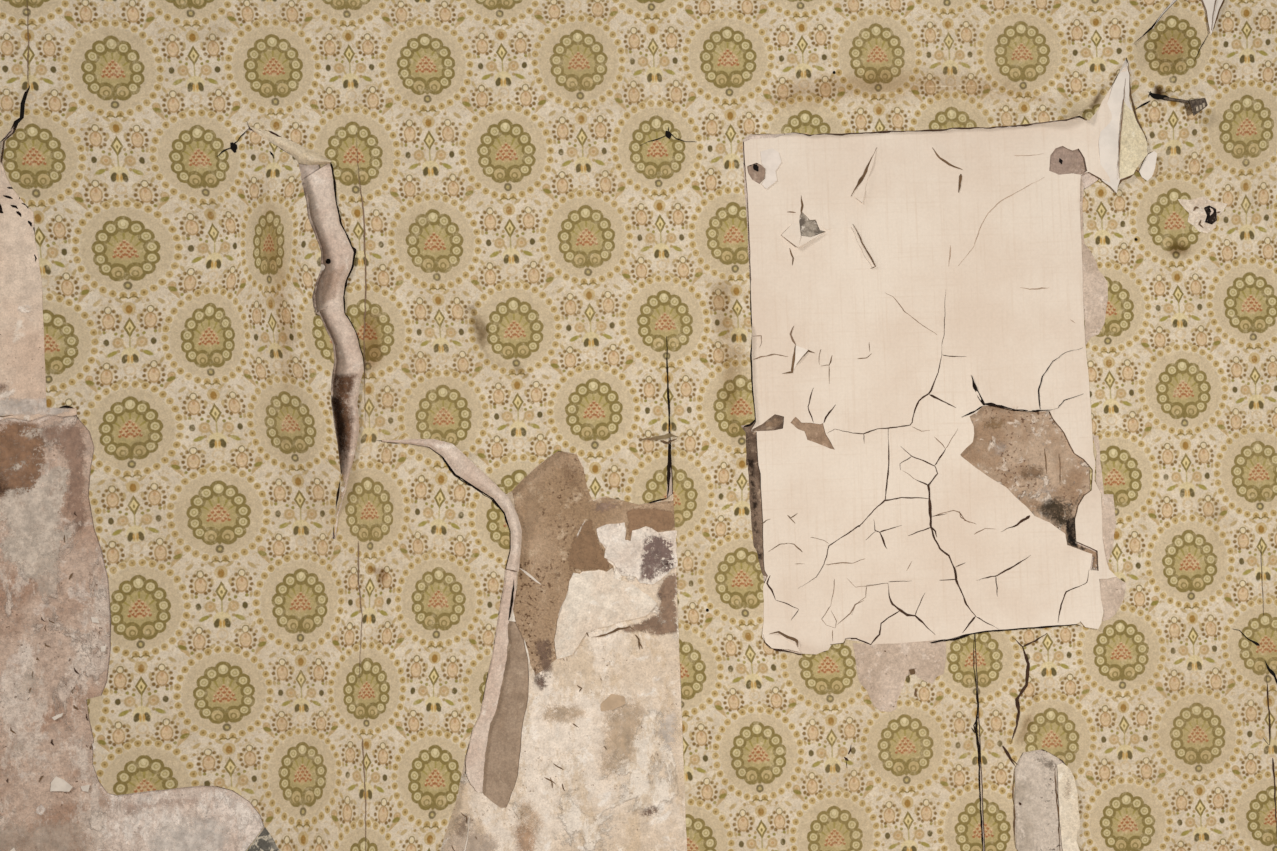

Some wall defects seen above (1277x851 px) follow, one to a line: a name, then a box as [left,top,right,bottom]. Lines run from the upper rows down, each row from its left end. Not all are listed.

peeling [1203,0,1225,35]
crack [794,116,1085,266]
peeling [1049,57,1157,193]
flaking render [0,138,264,851]
flaking render [440,451,687,851]
crack [649,336,671,503]
crack [744,273,788,427]
crack [762,294,1089,848]
flaking render [960,406,1098,571]
crack [1234,544,1277,828]
flaking render [1002,746,1080,851]